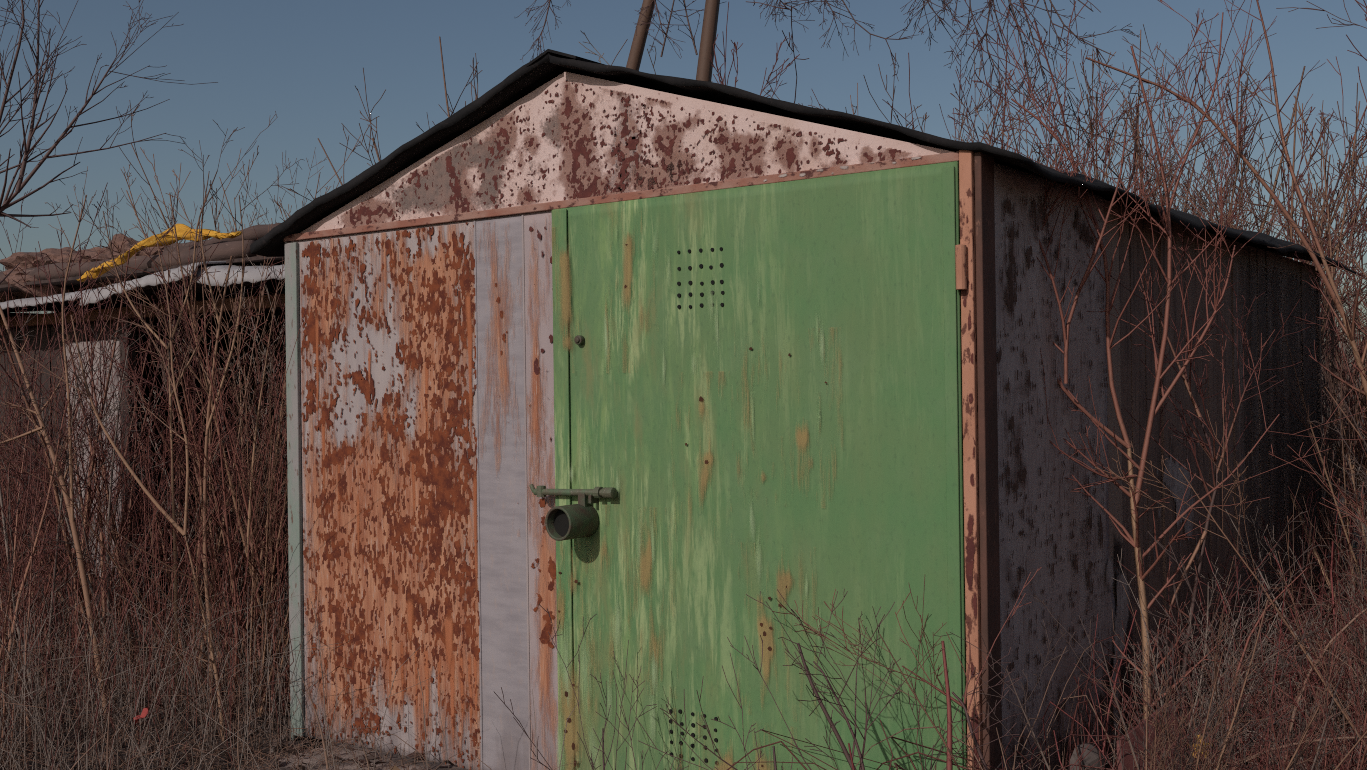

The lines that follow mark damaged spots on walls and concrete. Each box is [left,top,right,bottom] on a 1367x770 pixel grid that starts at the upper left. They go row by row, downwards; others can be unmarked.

corrosion [300,222,579,770]
leakage [1121,610,1134,735]